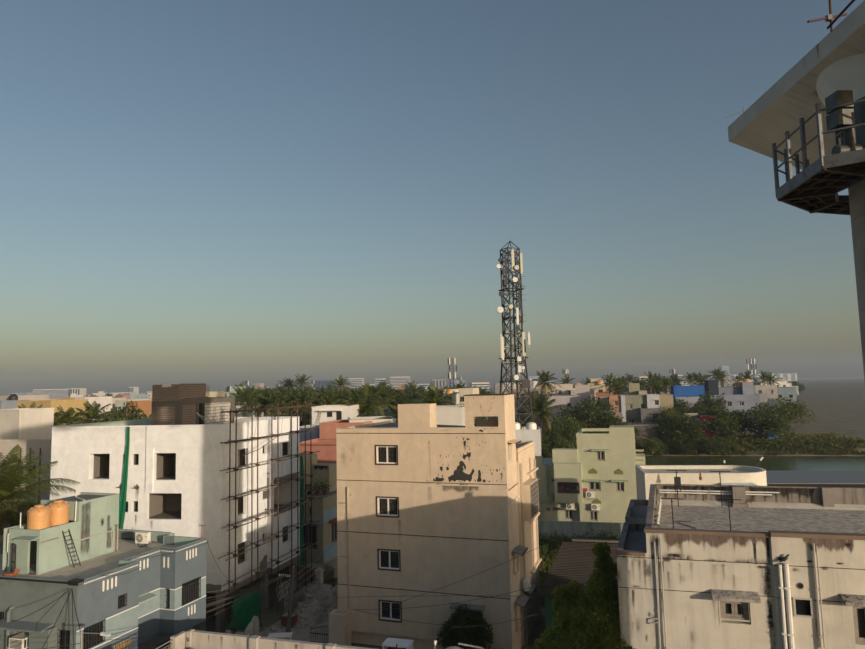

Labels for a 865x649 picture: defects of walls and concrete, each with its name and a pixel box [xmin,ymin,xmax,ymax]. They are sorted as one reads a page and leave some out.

peeling [426,420,502,485]
leakage [803,538,853,562]
leakage [639,534,782,644]